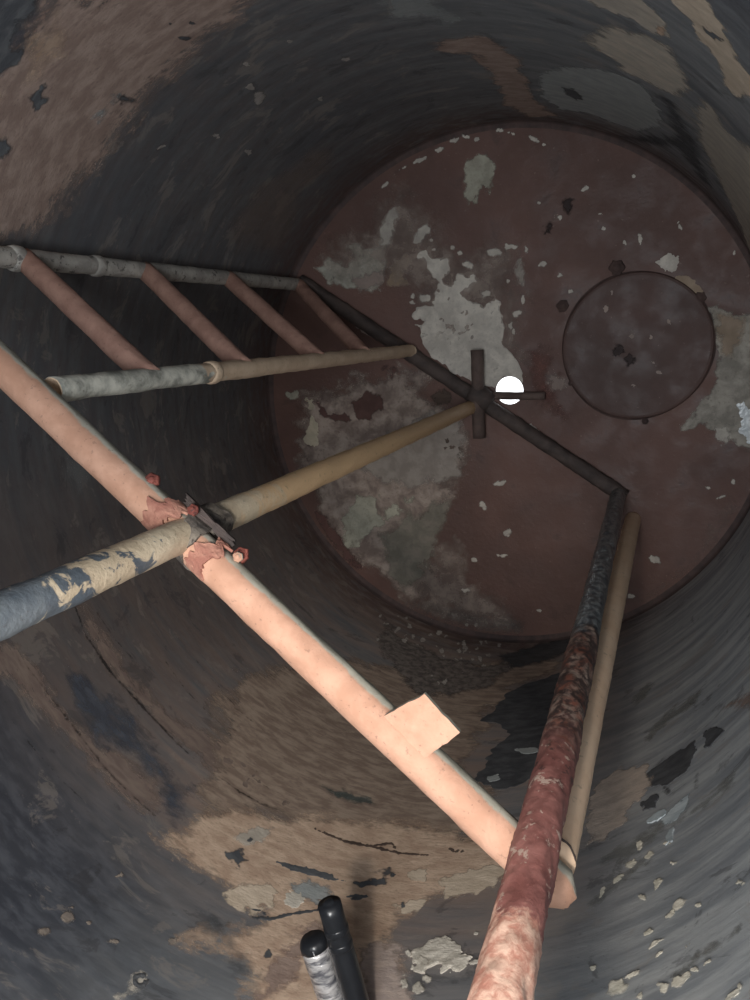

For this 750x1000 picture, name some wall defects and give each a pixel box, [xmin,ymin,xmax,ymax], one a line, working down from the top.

peeling [399,135,480,170]
peeling [464,155,495,203]
peeling [317,206,528,388]
peeling [681,306,750,448]
peeling [347,614,560,794]
peeling [586,726,725,844]
peeling [164,666,505,1000]
crack [314,828,429,856]
peeling [599,840,654,898]
peeling [665,899,701,918]
peeling [608,970,639,995]
peeling [657,959,711,993]